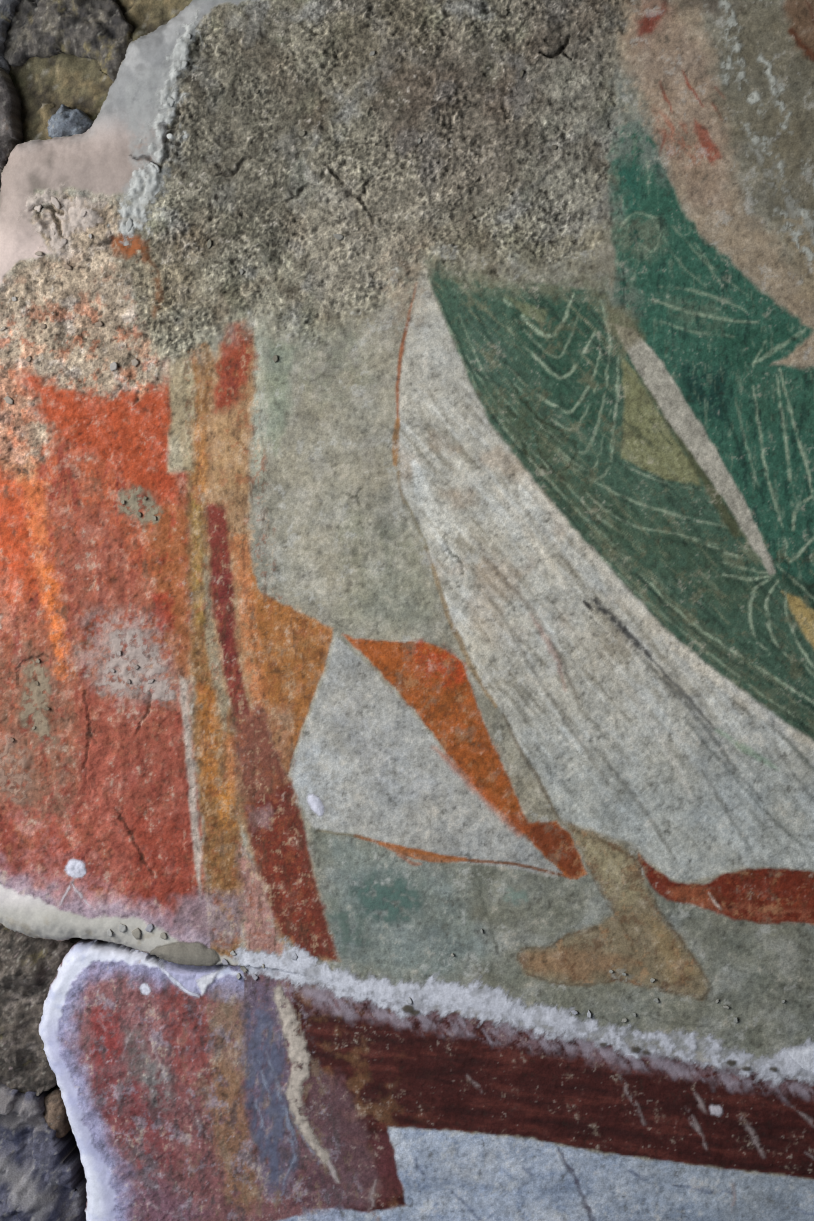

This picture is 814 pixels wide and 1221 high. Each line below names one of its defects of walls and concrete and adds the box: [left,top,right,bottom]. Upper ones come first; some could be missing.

spalling [0,0,628,473]
crack [68,924,265,981]